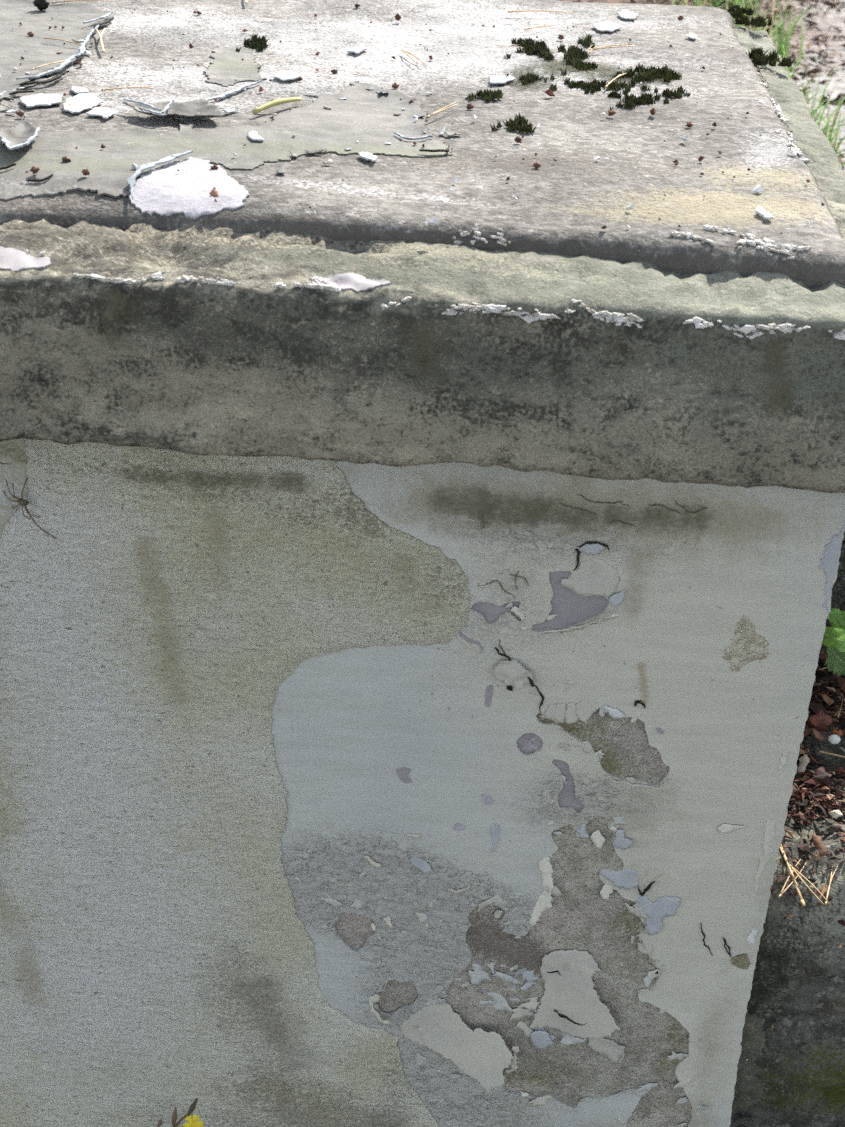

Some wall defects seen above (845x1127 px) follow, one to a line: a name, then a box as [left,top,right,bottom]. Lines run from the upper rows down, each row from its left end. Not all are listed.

peeling [0,0,462,219]
peeling [755,206,773,219]
peeling [453,224,511,246]
peeling [670,225,811,260]
peeling [441,299,644,328]
peeling [683,317,810,339]
peeling [0,438,29,539]
peeling [271,461,845,1127]